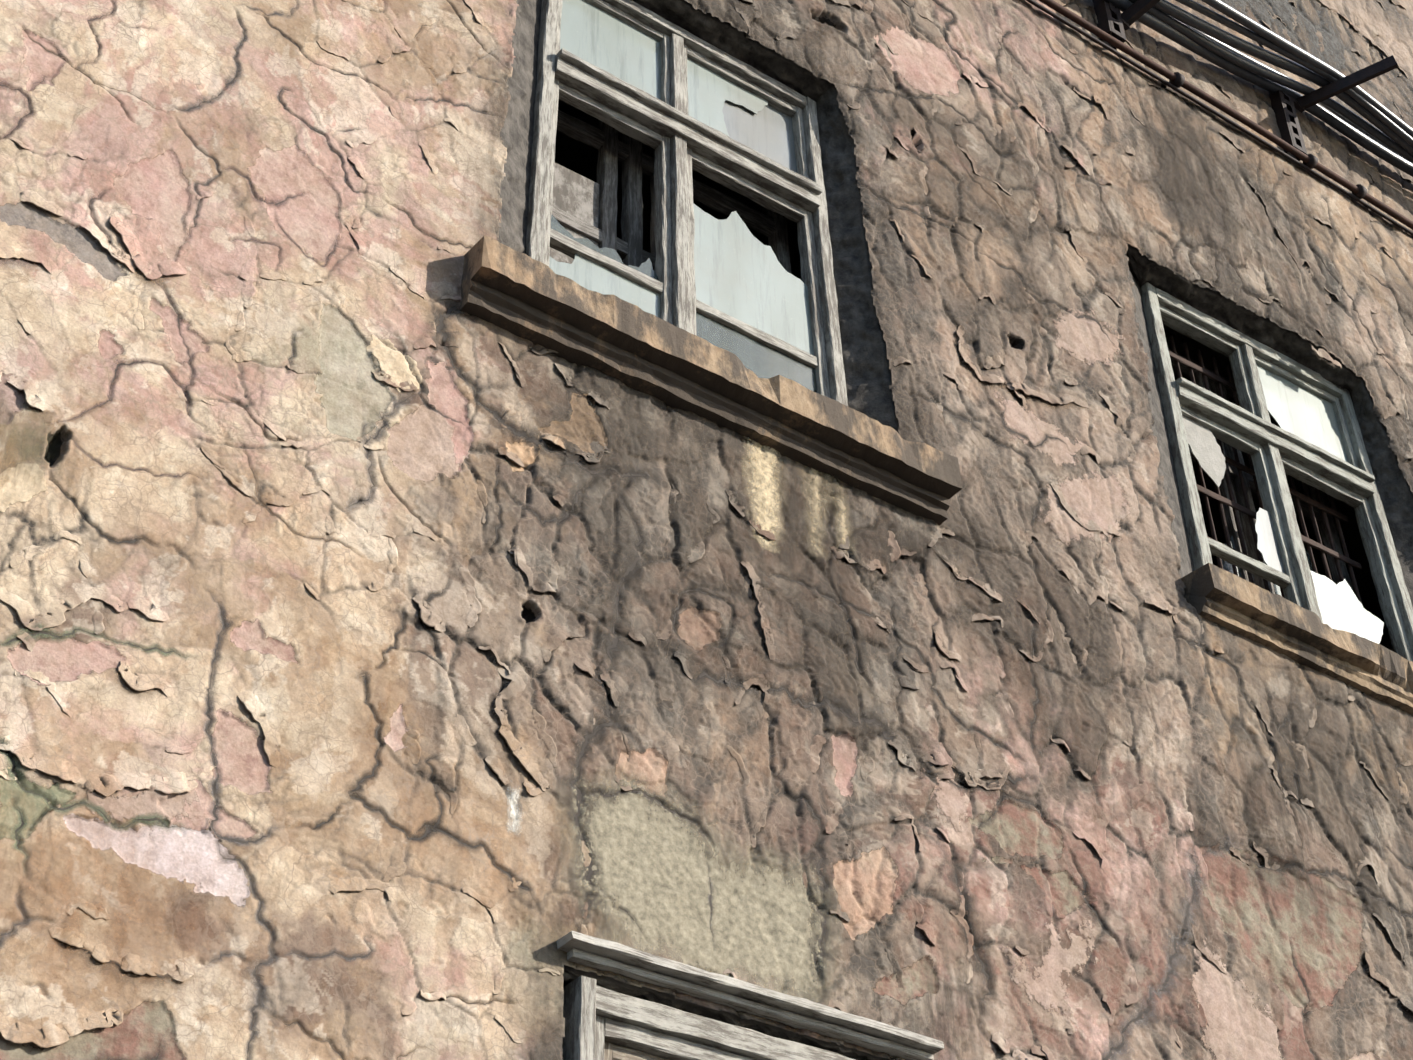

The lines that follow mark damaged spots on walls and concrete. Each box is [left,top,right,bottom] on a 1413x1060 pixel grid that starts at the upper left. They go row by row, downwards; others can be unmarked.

peeling [0,144,366,364]
crack [0,5,485,267]
crack [66,289,194,477]
peeling [287,303,488,524]
peeling [0,1000,187,1060]
peeling [0,691,281,907]
crack [0,602,372,1060]
crack [311,588,531,892]
crack [349,302,708,921]
crack [672,574,1063,829]
peeling [829,840,939,1005]
peeling [1183,811,1413,1060]